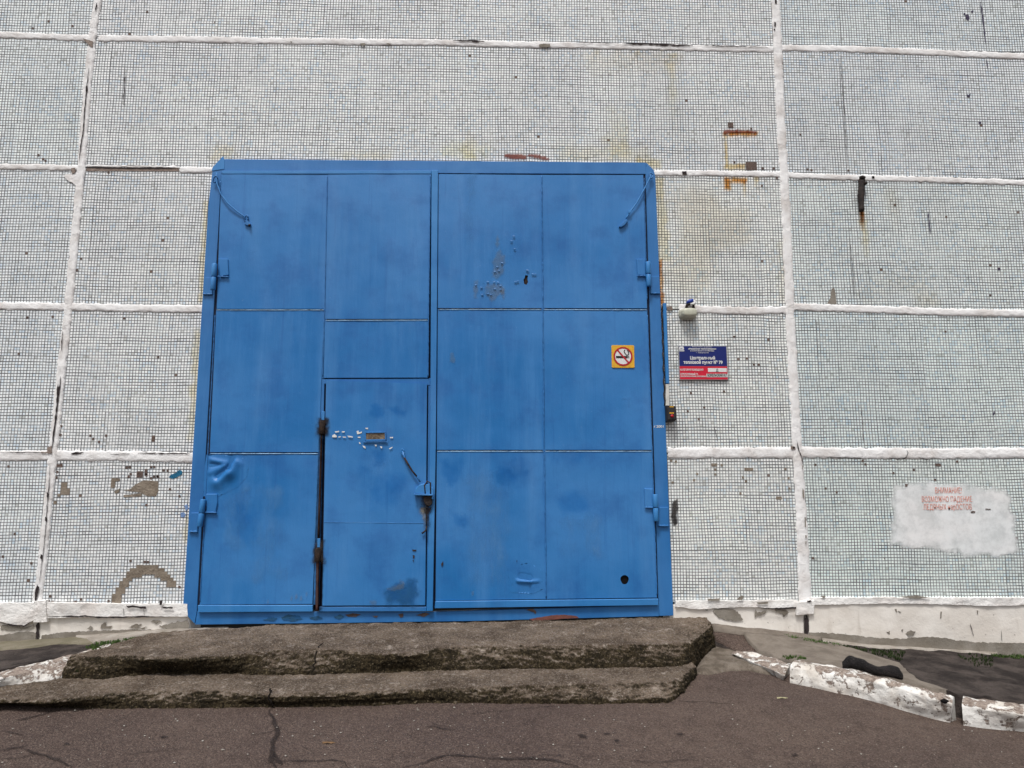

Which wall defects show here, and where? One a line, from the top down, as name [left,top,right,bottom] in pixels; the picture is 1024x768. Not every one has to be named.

spalling [107,560,181,603]